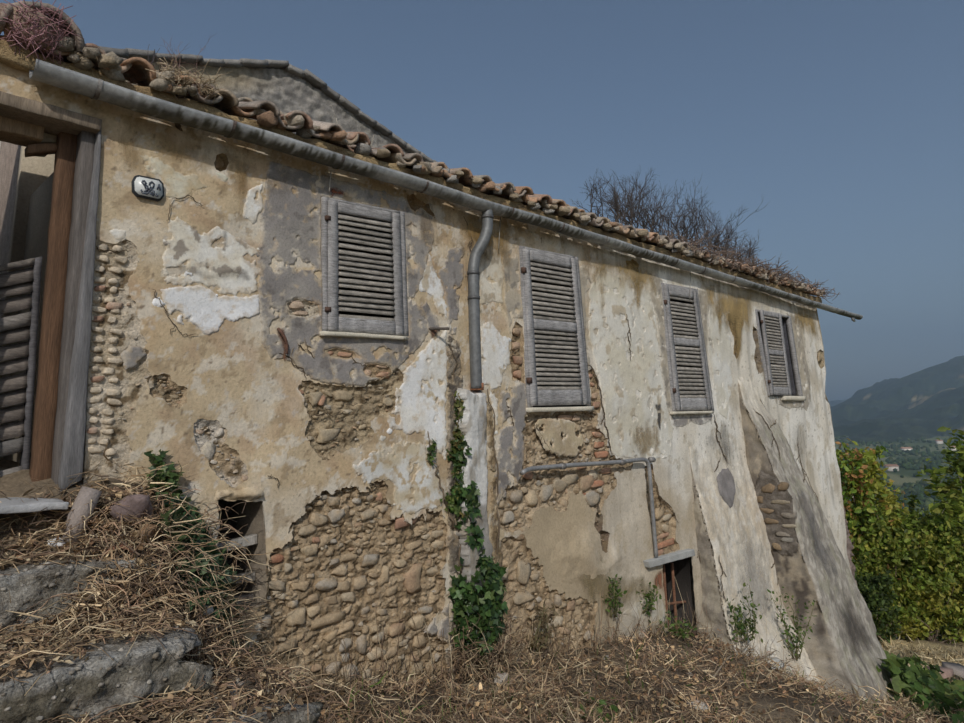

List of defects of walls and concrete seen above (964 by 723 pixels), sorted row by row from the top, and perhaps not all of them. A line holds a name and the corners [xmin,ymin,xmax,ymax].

crack [153,289,193,336]
peeling [152,216,260,335]
damp [596,261,651,303]
damp [708,288,751,354]
spalling [83,229,187,485]
spalling [193,418,248,488]
spalling [249,249,680,689]
crack [714,415,727,472]
spalling [754,469,799,556]